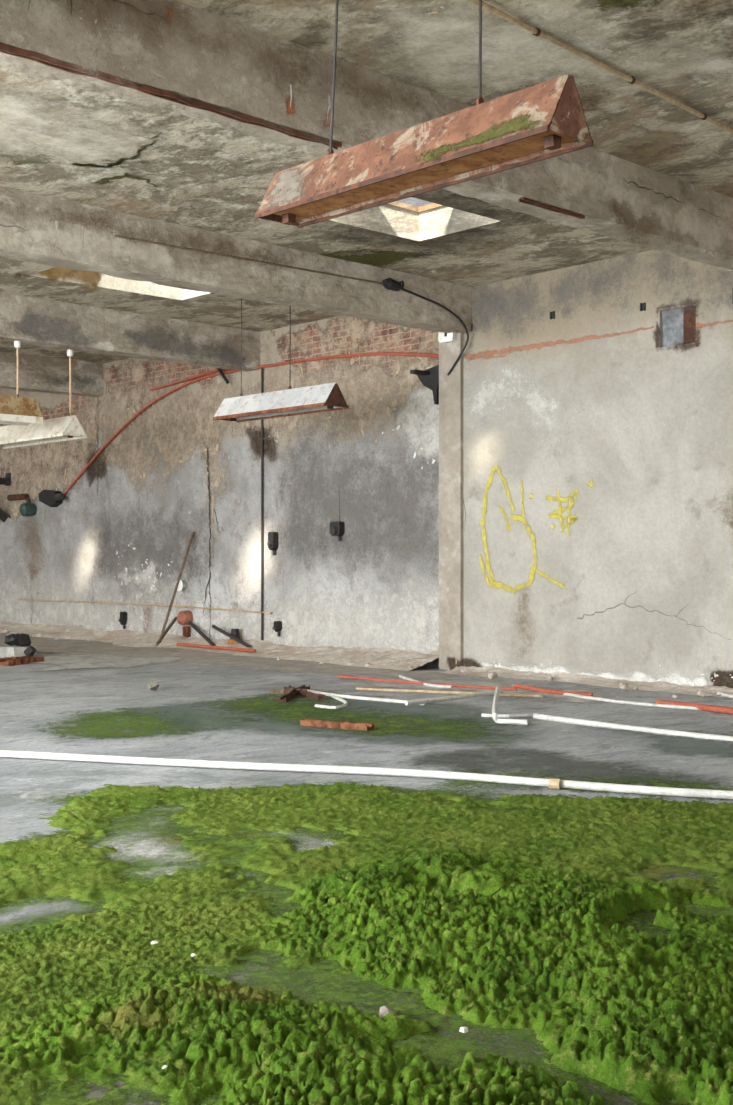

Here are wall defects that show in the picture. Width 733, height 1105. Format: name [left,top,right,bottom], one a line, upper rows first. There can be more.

peeling [0,316,439,522]
damp [99,437,227,598]
damp [281,440,439,580]
crack [577,590,731,640]